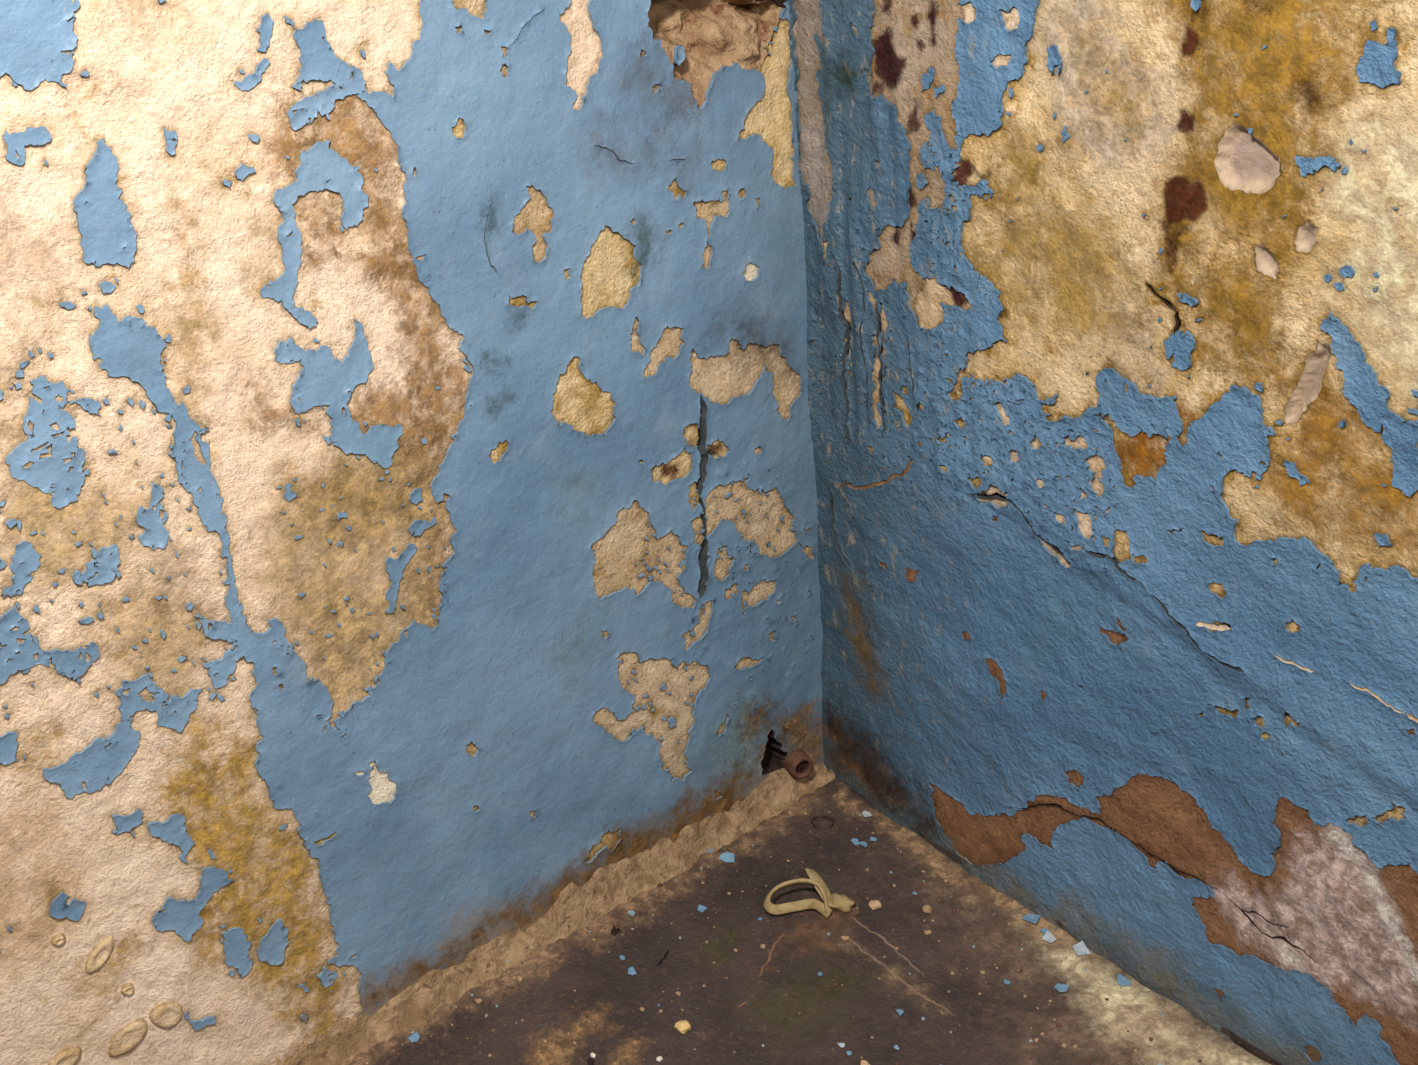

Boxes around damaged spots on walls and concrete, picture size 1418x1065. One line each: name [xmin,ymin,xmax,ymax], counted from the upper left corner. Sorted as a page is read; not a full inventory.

peeling [452,0,489,34]
spalling [639,0,877,269]
peeling [0,0,473,1065]
peeling [551,356,615,436]
peeling [563,219,801,420]
peeling [591,423,814,780]
crack [696,395,714,598]
peeling [985,658,1006,704]
peeling [852,0,1418,592]
peeling [1199,697,1270,740]
peeling [929,769,1418,1065]
efflorescence [1212,823,1418,1026]